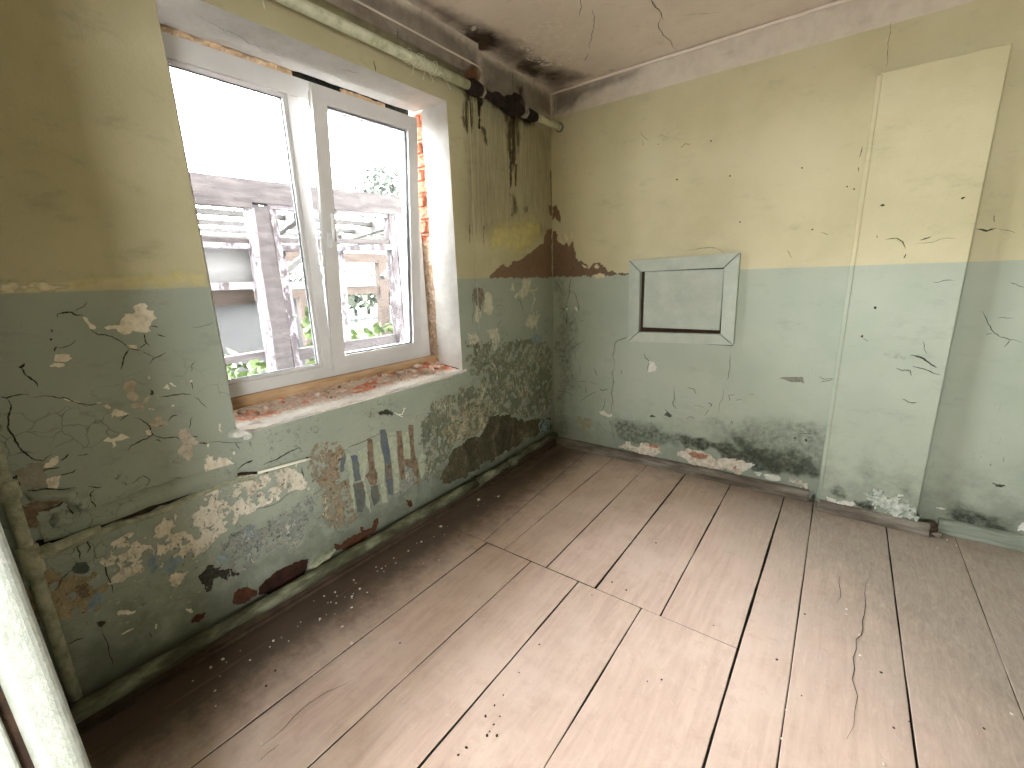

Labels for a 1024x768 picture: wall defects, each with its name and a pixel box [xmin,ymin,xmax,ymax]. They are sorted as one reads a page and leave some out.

damp [345,0,578,85]
damp [463,98,487,143]
damp [506,115,520,188]
peeling [291,70,553,500]
crack [54,302,165,370]
peeling [83,303,158,348]
crack [2,362,298,468]
flaking render [619,441,661,457]
damp [616,421,819,476]
peeling [44,441,357,663]
peeling [26,586,43,624]
crack [837,575,871,738]